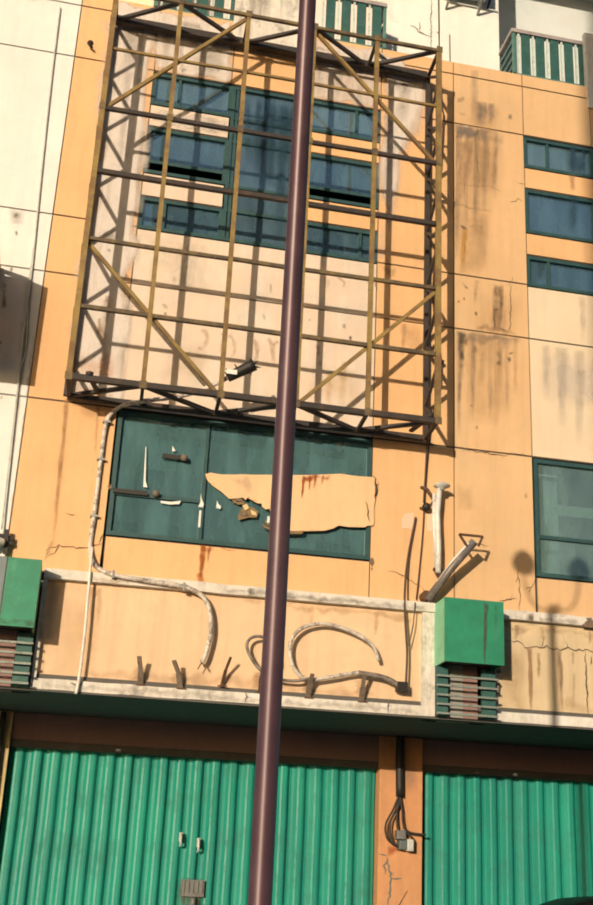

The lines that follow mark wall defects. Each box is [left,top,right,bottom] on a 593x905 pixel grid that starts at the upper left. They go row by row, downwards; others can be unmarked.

peeling [205,473,272,530]
peeling [290,474,378,534]
crack [499,568,535,605]
crack [506,640,593,713]
crack [380,854,402,905]